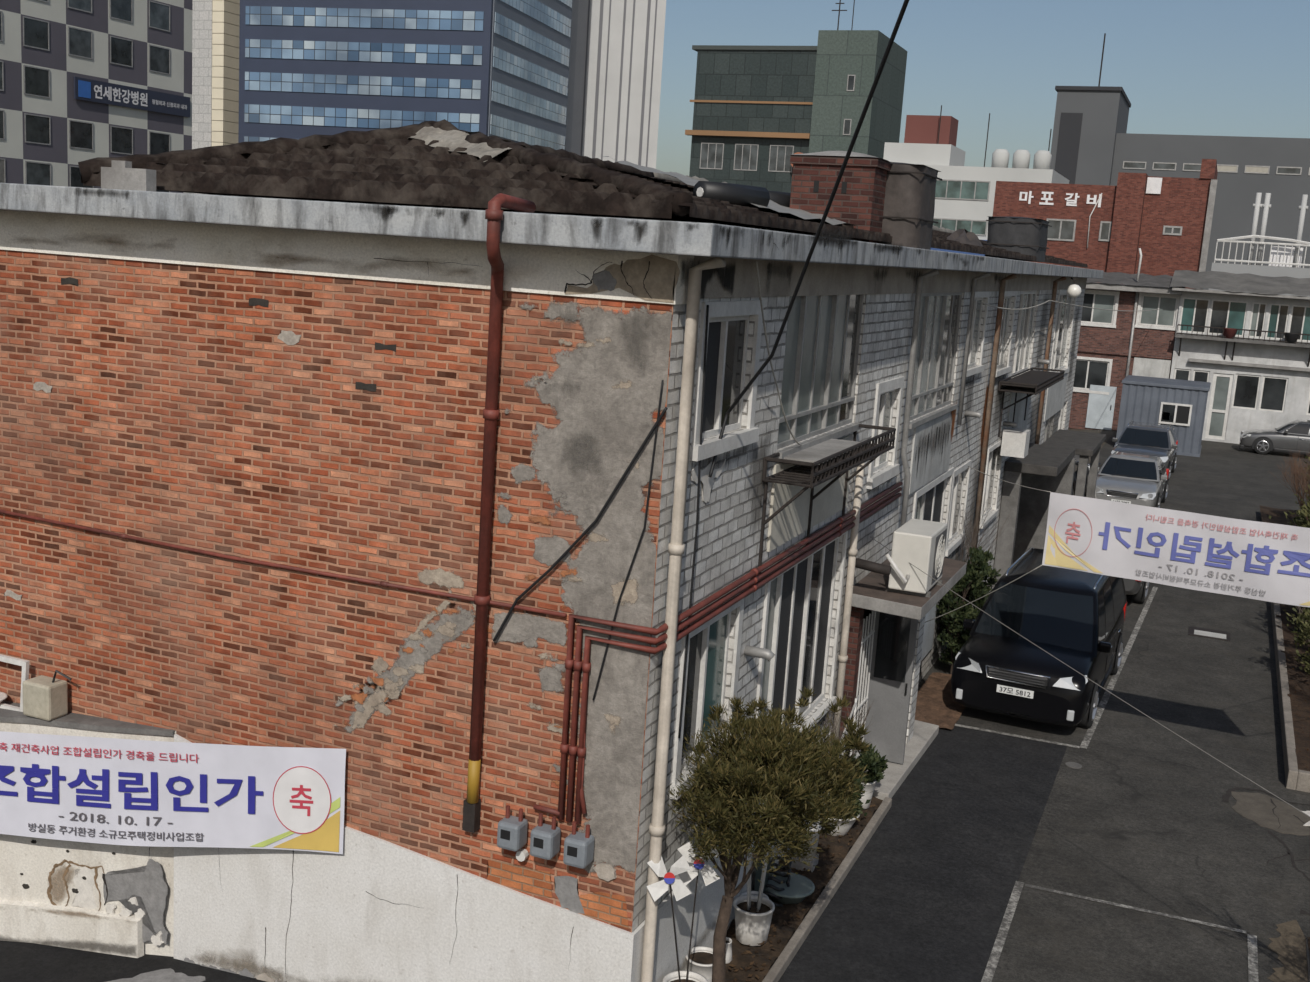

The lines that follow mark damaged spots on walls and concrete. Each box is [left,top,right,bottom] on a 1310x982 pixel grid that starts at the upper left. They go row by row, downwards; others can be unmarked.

crack [564,262,612,293]
peeling [611,578,639,605]
spalling [47,850,168,946]